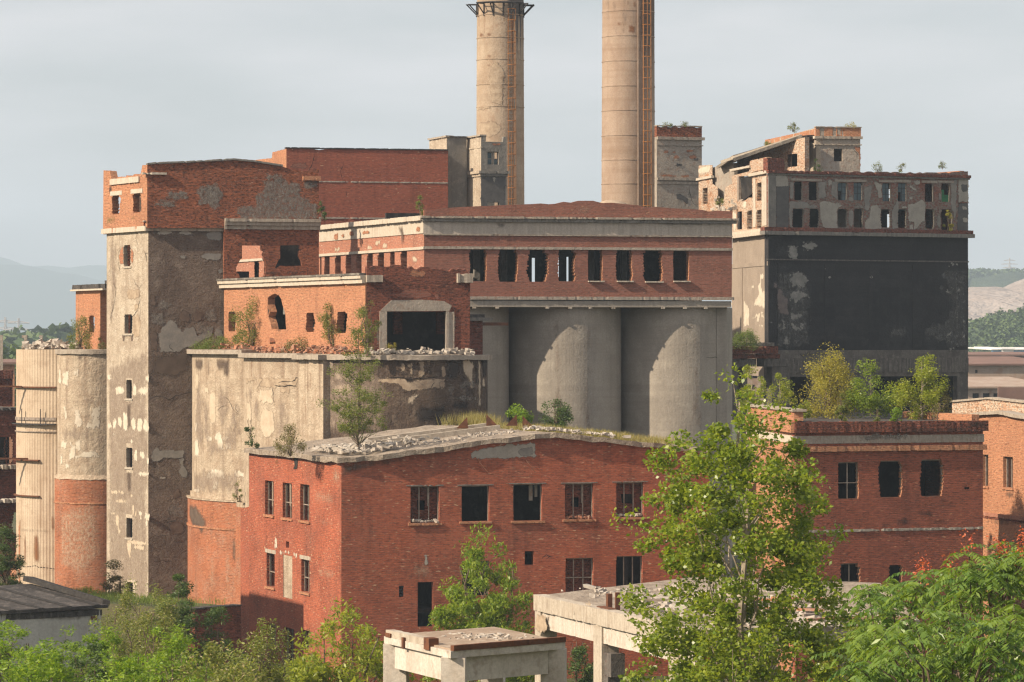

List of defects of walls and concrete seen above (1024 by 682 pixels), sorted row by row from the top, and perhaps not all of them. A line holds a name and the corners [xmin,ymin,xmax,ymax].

flaking render [237,174,317,219]
flaking render [776,175,941,230]
flaking render [938,179,969,230]
peeling [731,241,817,345]
flaking render [58,367,78,386]
flaking render [107,374,149,396]
flaking render [246,376,298,437]
damp [401,360,446,377]
damp [463,360,487,405]
flaking render [60,405,149,477]
flaking render [194,423,231,457]